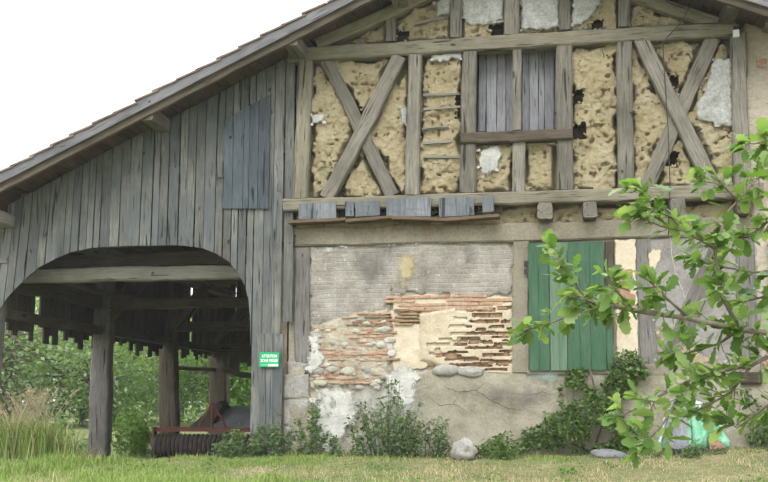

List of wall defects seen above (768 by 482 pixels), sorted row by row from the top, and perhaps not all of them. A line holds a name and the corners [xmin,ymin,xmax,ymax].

flaking render [618,269,636,311]
flaking render [304,293,513,452]
crack [432,382,555,410]